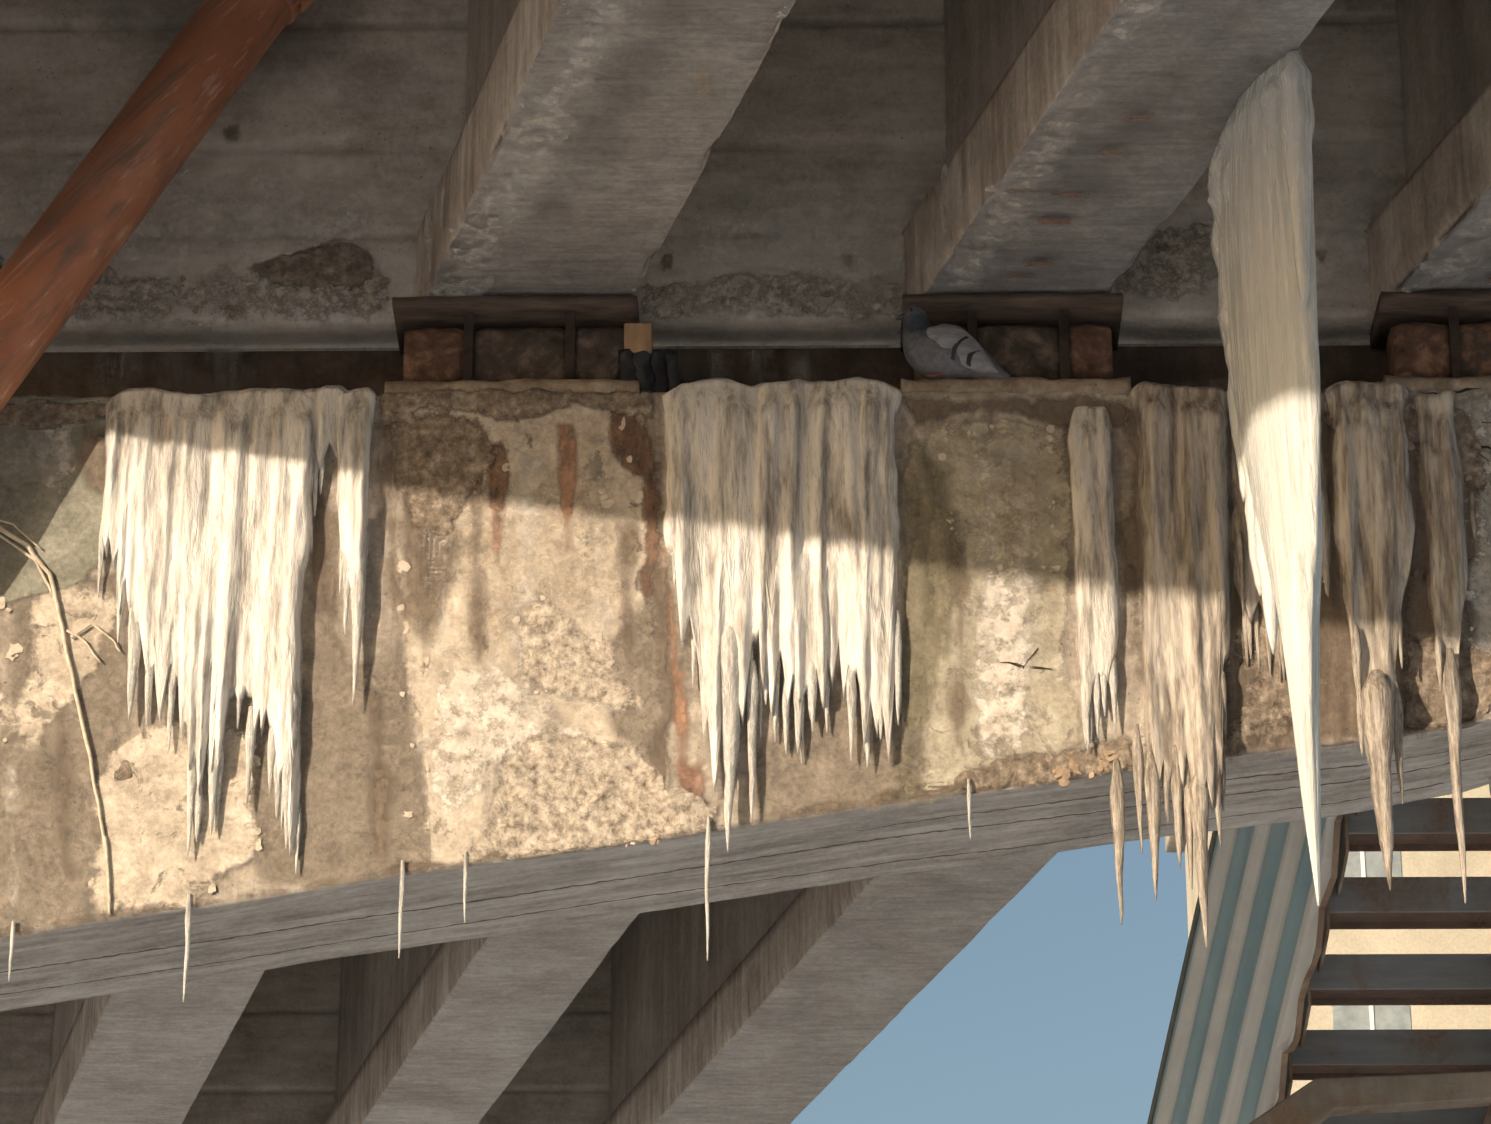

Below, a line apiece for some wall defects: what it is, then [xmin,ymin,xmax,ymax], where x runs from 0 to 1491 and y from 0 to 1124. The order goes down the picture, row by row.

spalling [73,242,389,334]
spalling [1116,223,1219,300]
rust [487,443,509,553]
rust [557,425,577,516]
crack [1418,388,1491,503]